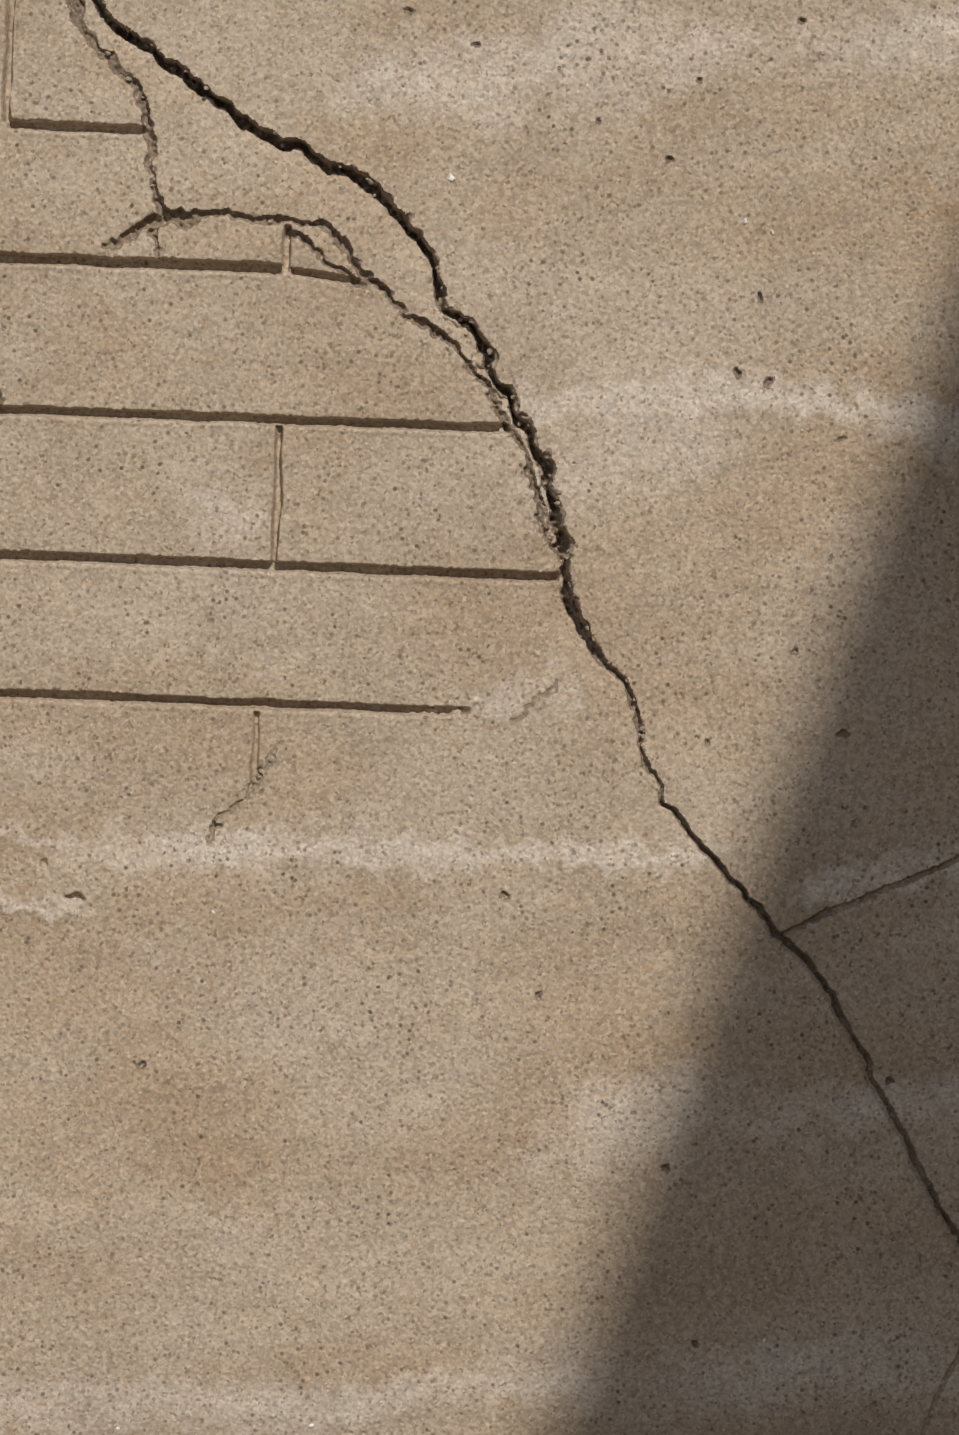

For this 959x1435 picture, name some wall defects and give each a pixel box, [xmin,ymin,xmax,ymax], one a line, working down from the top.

crack [65,0,670,807]
crack [205,740,284,844]
crack [664,804,959,1243]
crack [920,1345,959,1435]